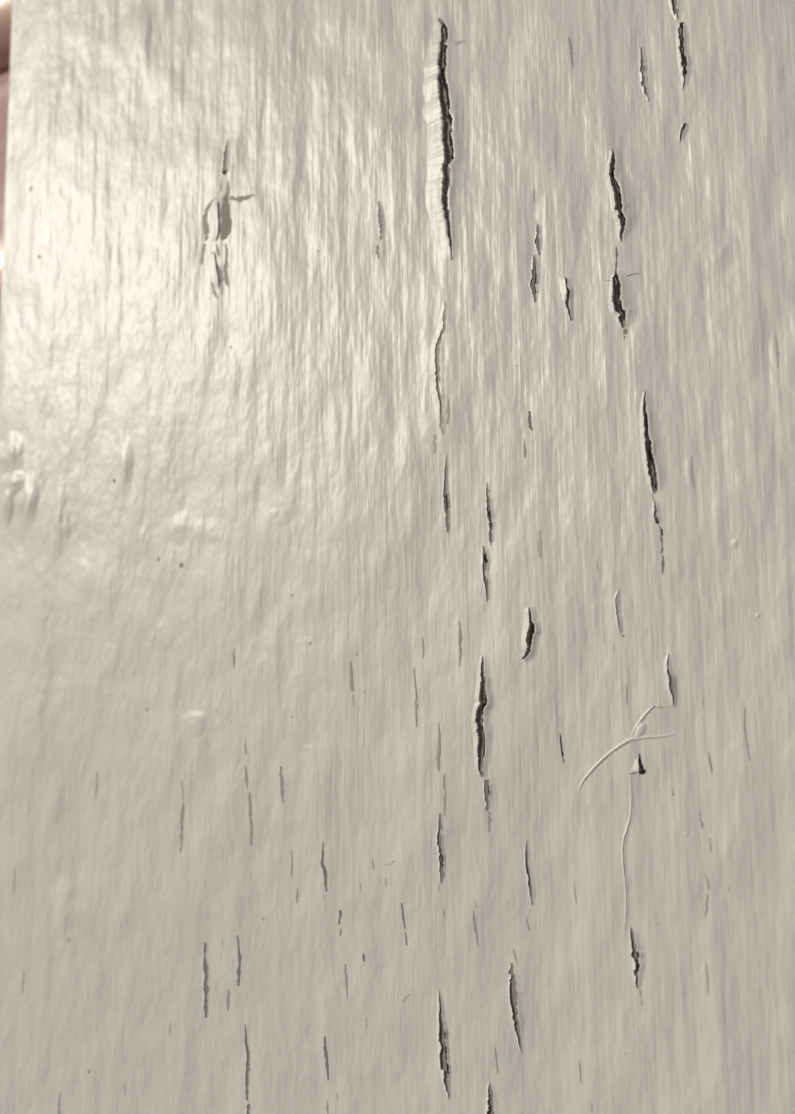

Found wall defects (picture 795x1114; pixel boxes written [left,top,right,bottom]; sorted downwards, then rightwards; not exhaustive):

crack [668,0,693,90]
crack [423,15,470,261]
peeling [208,200,219,290]
crack [528,188,575,321]
crack [605,147,639,339]
crack [429,301,452,533]
crack [480,483,496,602]
crack [639,391,694,574]
crack [522,606,542,663]
crack [458,621,497,833]
crack [436,991,452,1099]
crack [484,840,536,1114]